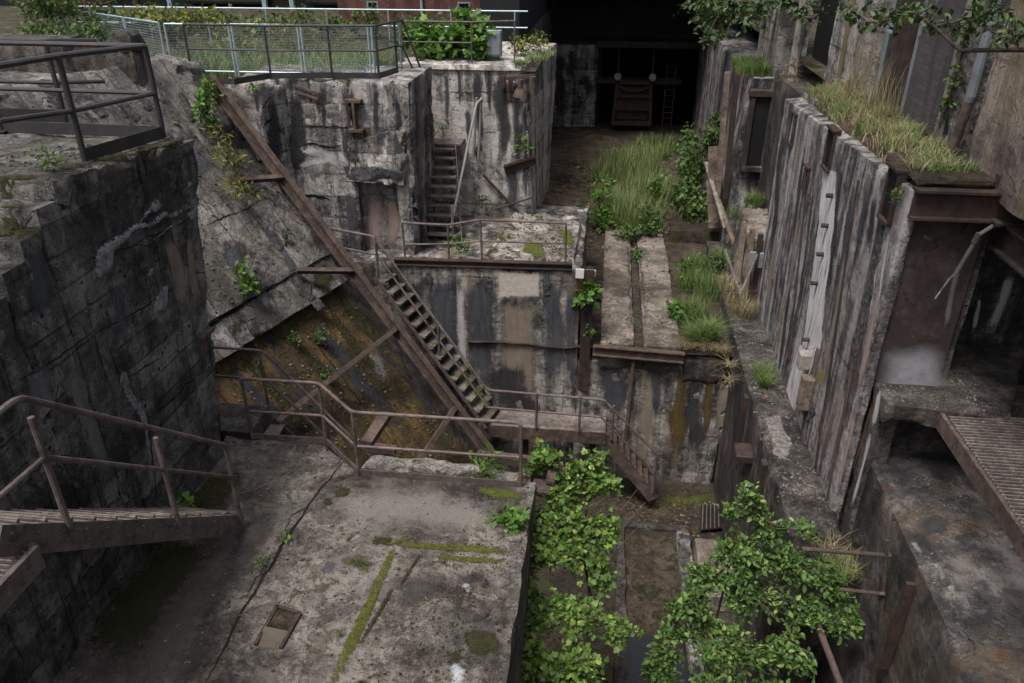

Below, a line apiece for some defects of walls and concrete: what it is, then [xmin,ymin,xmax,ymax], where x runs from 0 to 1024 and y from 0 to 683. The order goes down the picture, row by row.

water stain [444,71,533,210]
water stain [95,200,199,314]
water stain [770,137,813,368]
water stain [829,172,876,330]
water stain [601,367,628,413]
water stain [637,365,743,458]
water stain [836,234,890,485]
crack [206,461,344,681]